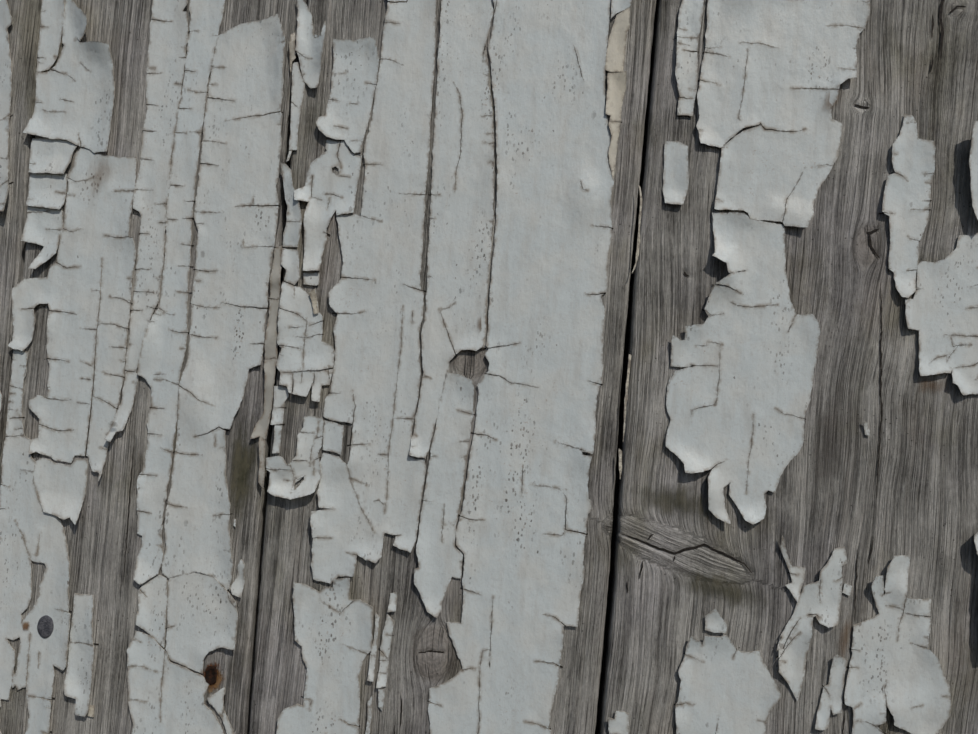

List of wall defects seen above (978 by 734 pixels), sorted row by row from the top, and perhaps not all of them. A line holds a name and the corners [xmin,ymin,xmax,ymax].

peeling [0,0,632,734]
peeling [663,0,870,524]
peeling [879,114,978,395]
crack [620,533,752,593]
peeling [674,535,852,734]
peeling [815,555,951,734]